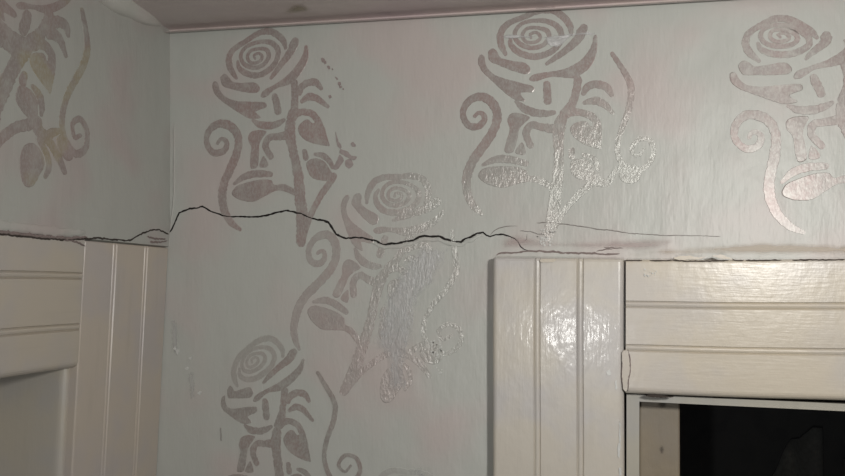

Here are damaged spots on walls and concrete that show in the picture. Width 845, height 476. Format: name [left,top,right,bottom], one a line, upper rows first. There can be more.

crack [0,205,845,262]